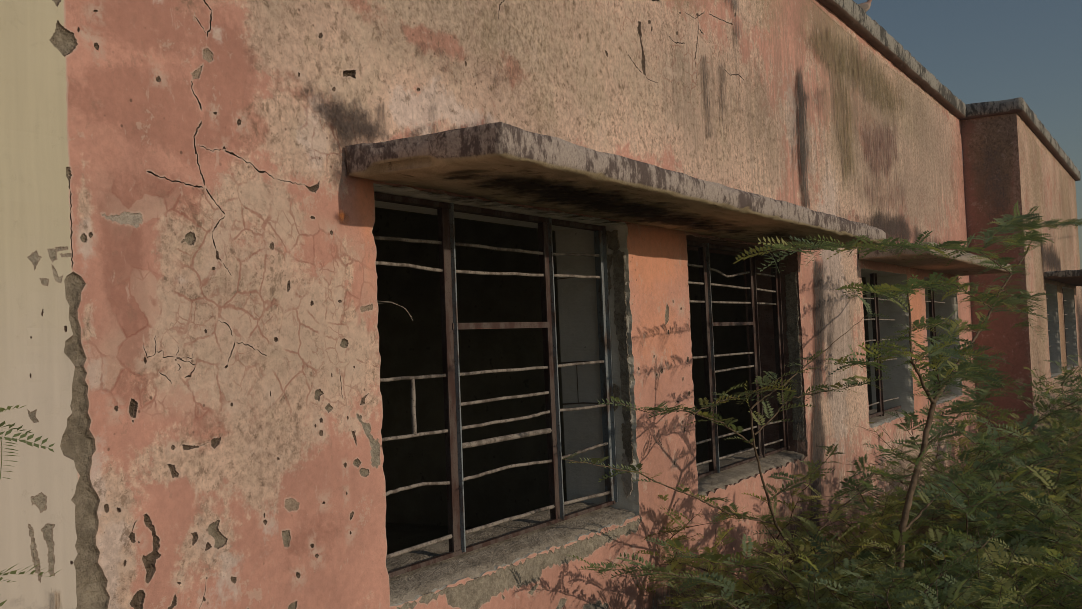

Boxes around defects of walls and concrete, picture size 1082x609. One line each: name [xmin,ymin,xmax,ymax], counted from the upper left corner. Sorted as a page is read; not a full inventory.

spalling [50,20,80,57]
crack [669,12,733,80]
crack [147,0,300,275]
damp [795,69,821,209]
damp [420,170,750,243]
crack [144,336,195,384]
crack [220,321,267,368]
peeling [606,230,640,499]
spalling [27,246,121,609]
damp [652,259,834,609]
spalling [128,513,161,609]
peeling [397,517,642,609]